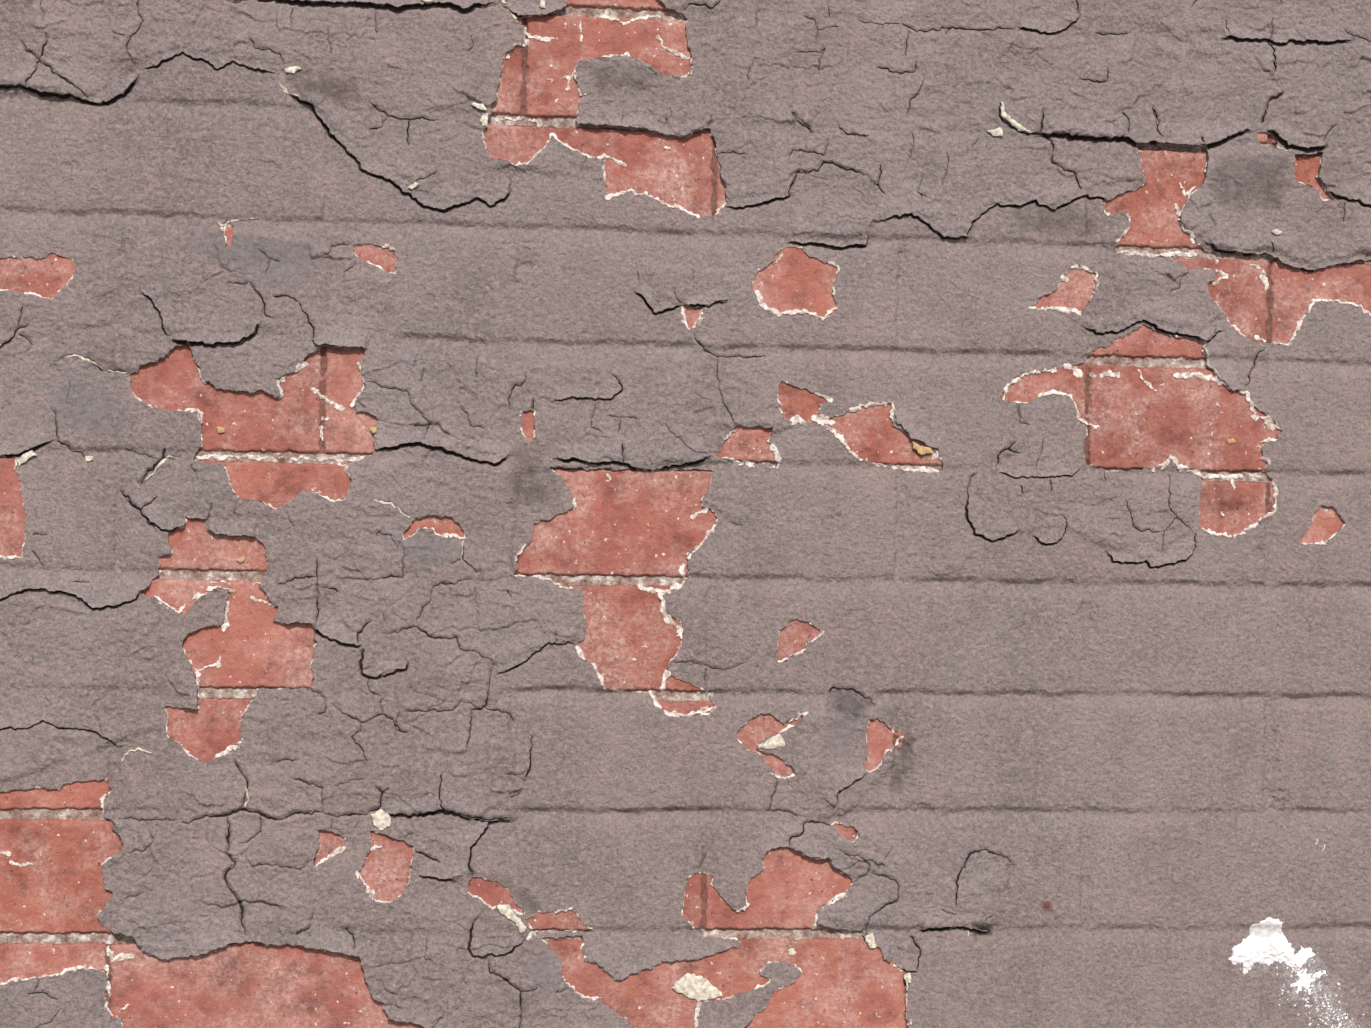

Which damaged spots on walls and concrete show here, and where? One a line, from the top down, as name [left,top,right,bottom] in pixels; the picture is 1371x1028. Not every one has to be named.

crack [23,3,89,97]
peeling [0,0,793,218]
crack [789,0,1163,198]
crack [1261,0,1283,123]
crack [121,448,236,530]
peeling [0,279,511,762]
crack [231,251,315,344]
peeling [490,381,946,718]
peeling [752,101,1371,568]
peeling [0,698,453,1028]
crack [119,543,525,930]
peeling [355,686,1015,1028]